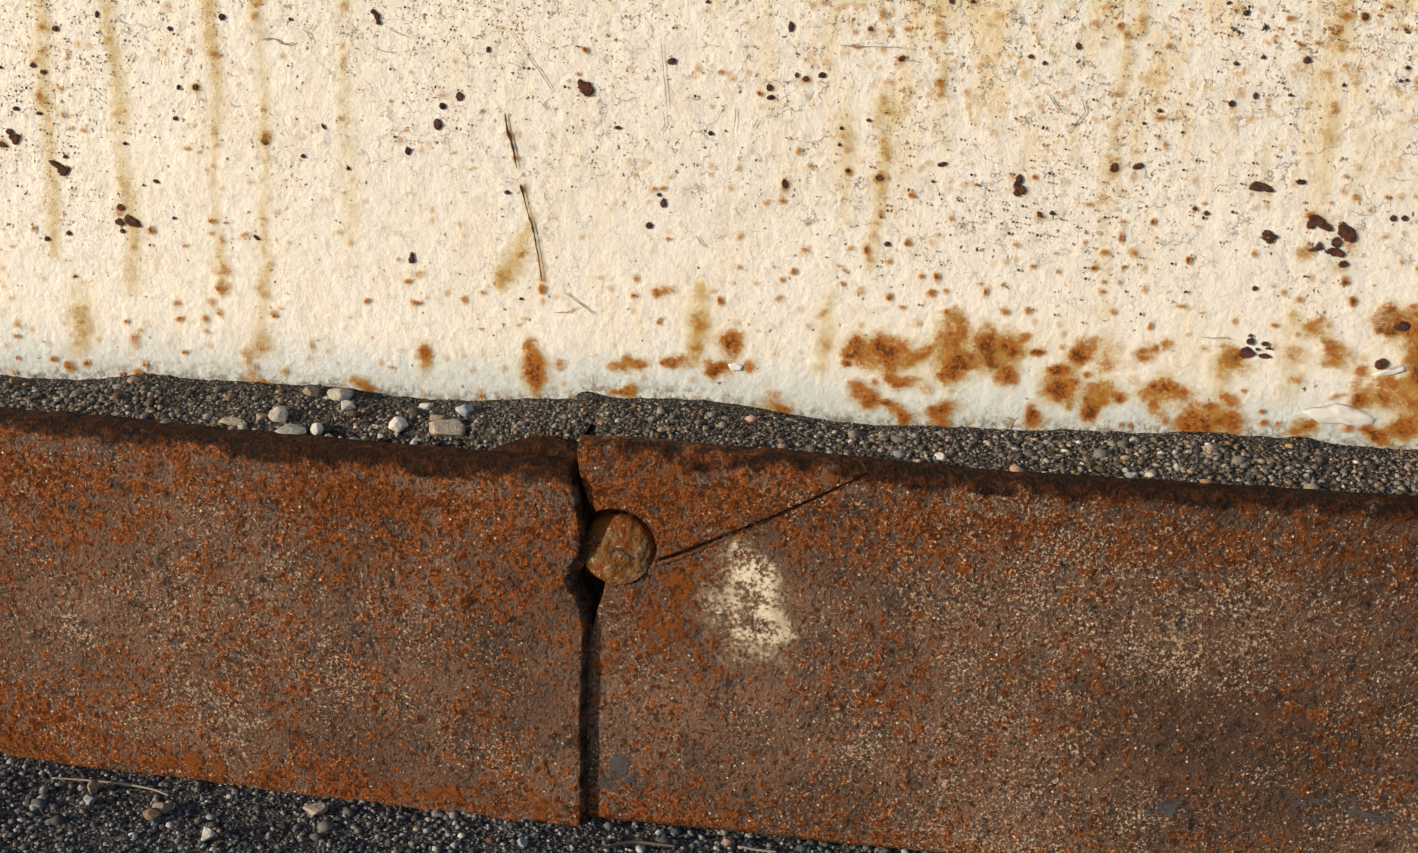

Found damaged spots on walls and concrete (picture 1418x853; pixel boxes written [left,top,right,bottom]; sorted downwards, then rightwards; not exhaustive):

corrosion [30,48,85,132]
corrosion [202,266,229,333]
corrosion [630,275,674,299]
corrosion [919,273,940,297]
corrosion [1340,277,1357,307]
corrosion [120,319,147,377]
corrosion [417,344,432,368]
corrosion [521,339,564,392]
corrosion [606,284,754,398]
corrosion [824,307,1317,437]
corrosion [1271,290,1418,449]
crack [656,459,868,566]